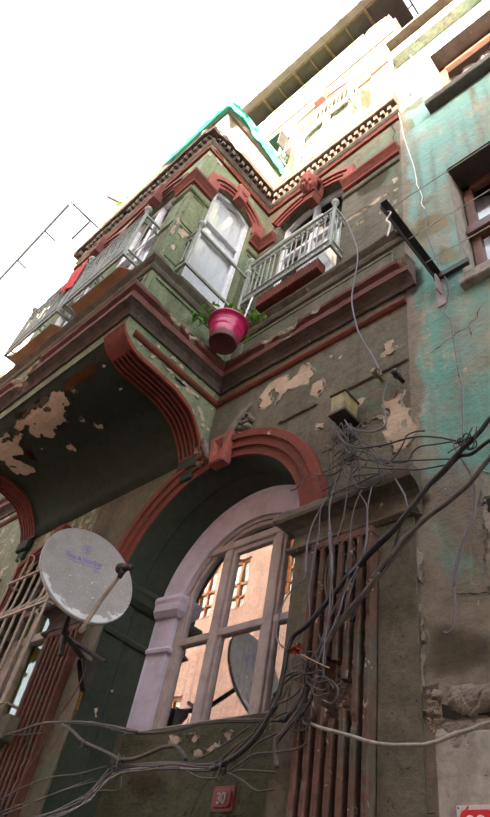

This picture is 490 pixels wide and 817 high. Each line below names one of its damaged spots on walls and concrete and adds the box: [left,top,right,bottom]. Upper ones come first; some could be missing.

peeling [380,339,399,357]
peeling [258,362,326,410]
peeling [0,386,104,476]
peeling [363,387,419,455]
peeling [471,466,490,591]
spalling [419,604,490,736]
peeling [167,729,235,758]